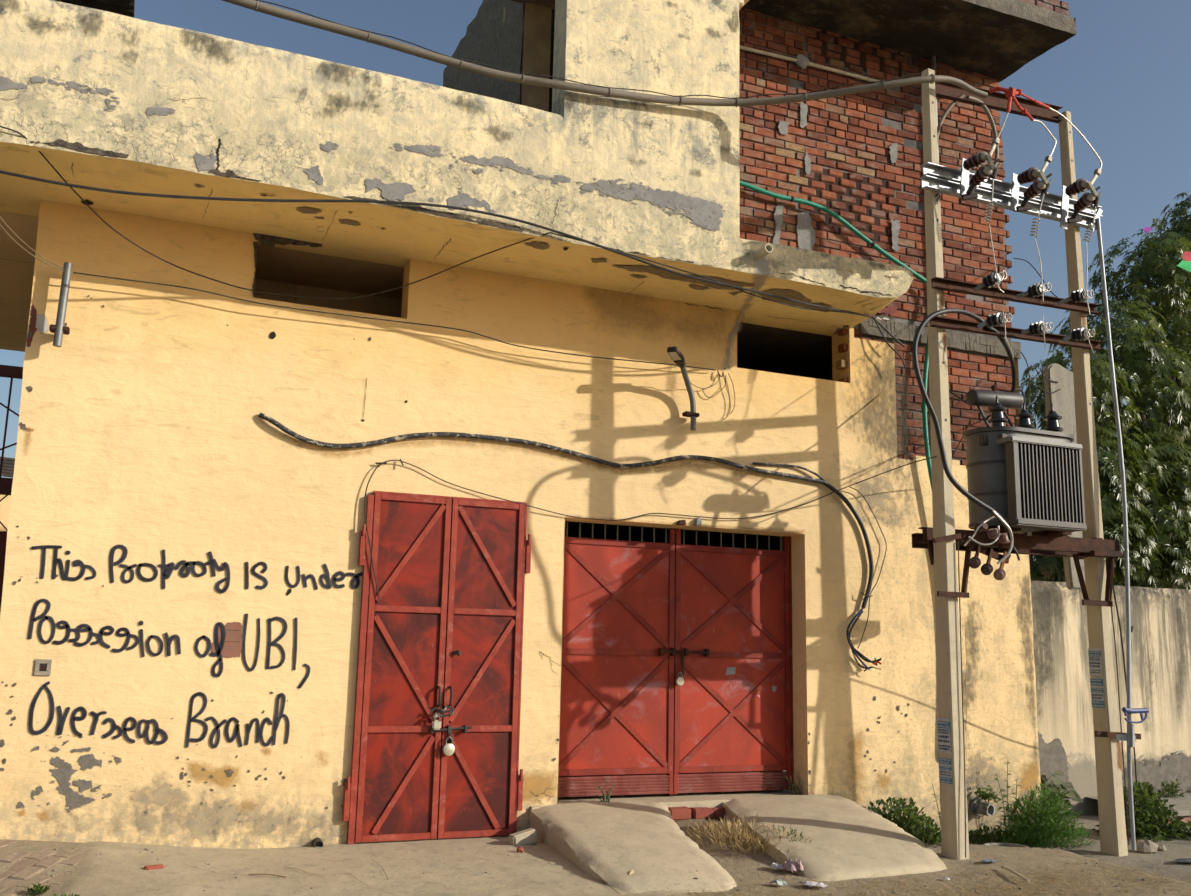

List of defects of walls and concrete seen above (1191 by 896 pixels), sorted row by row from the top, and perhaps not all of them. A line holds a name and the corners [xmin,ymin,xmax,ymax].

peeling [0,76,123,112]
spalling [30,139,129,158]
crack [203,139,221,218]
peeling [193,152,275,197]
peeling [338,178,568,251]
peeling [390,142,726,232]
water stain [850,343,914,526]
water stain [962,620,977,706]
water stain [1019,578,1059,719]
peeling [17,735,122,813]
water stain [966,753,1016,831]
water stain [1122,749,1191,794]